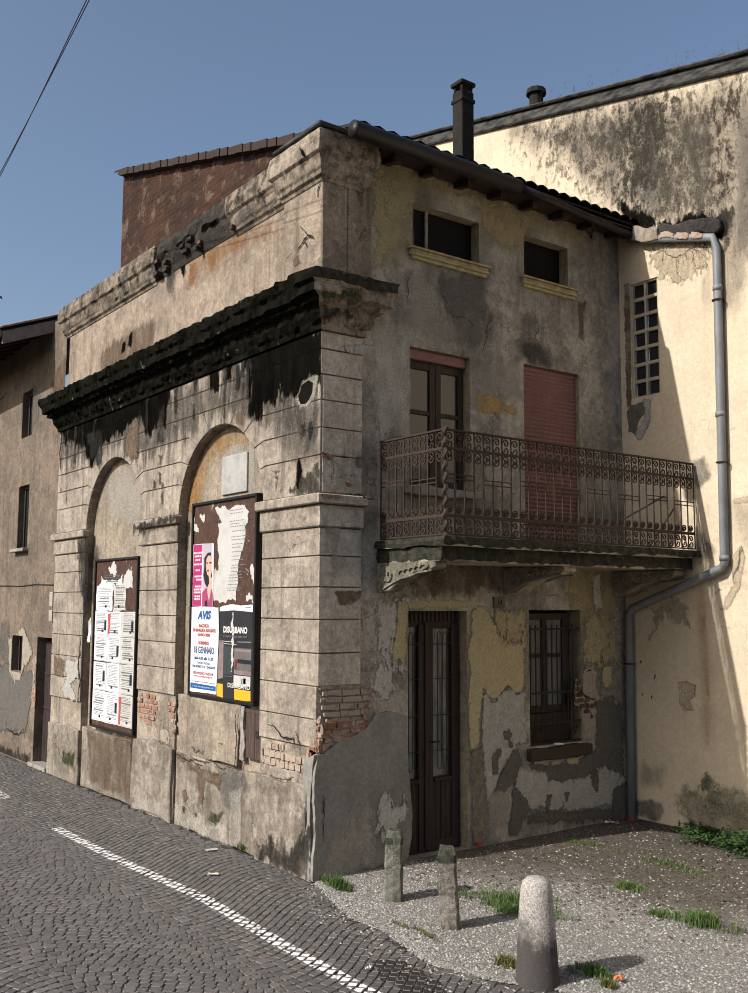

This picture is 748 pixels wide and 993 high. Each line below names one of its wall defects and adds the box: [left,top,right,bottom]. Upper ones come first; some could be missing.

leakage [520,73,748,253]
leakage [101,321,155,368]
leakage [209,304,356,425]
leakage [60,388,177,474]
leakage [109,468,176,536]
leakage [191,468,203,507]
leakage [289,458,319,496]
peeling [720,545,745,610]
flaking render [137,692,177,733]
peeling [262,573,660,849]
leakage [678,774,748,836]
leakage [250,821,313,882]